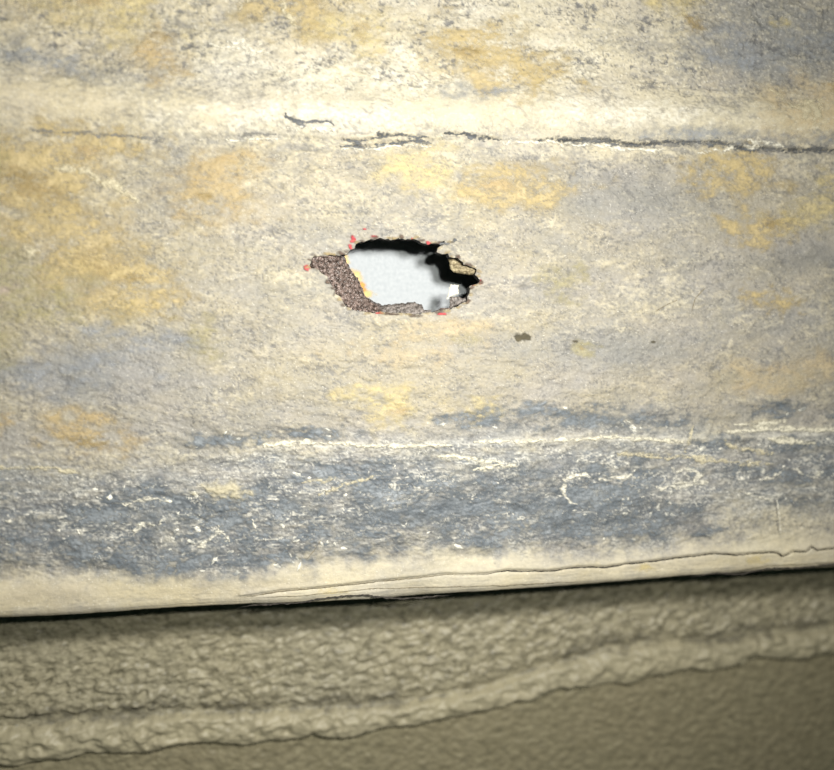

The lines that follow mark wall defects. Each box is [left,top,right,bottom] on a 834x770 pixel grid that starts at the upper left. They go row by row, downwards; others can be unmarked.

crack [32,128,165,142]
crack [239,112,498,149]
crack [538,136,834,153]
crack [741,491,781,532]
crack [240,547,834,608]